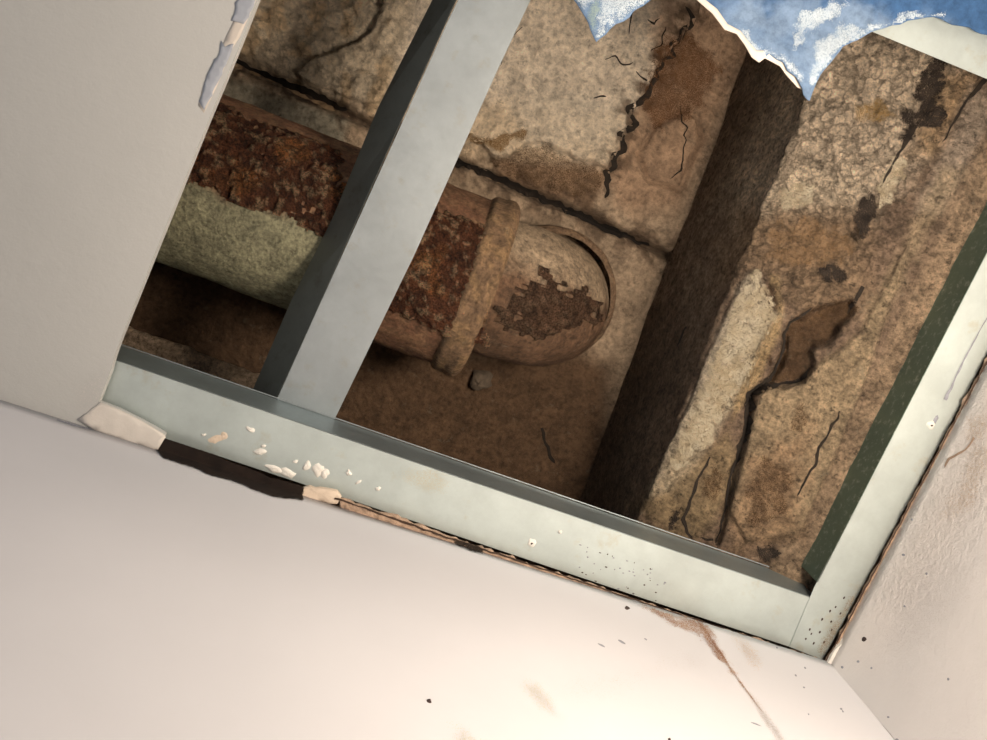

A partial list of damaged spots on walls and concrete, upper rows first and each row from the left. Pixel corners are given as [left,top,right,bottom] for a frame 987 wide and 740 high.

peeling [231,0,255,24]
peeling [199,41,234,110]
crack [236,59,347,112]
crack [455,6,696,246]
crack [882,124,916,184]
crack [942,78,987,142]
peeling [252,444,330,479]
crack [681,308,812,542]
crack [797,411,840,496]